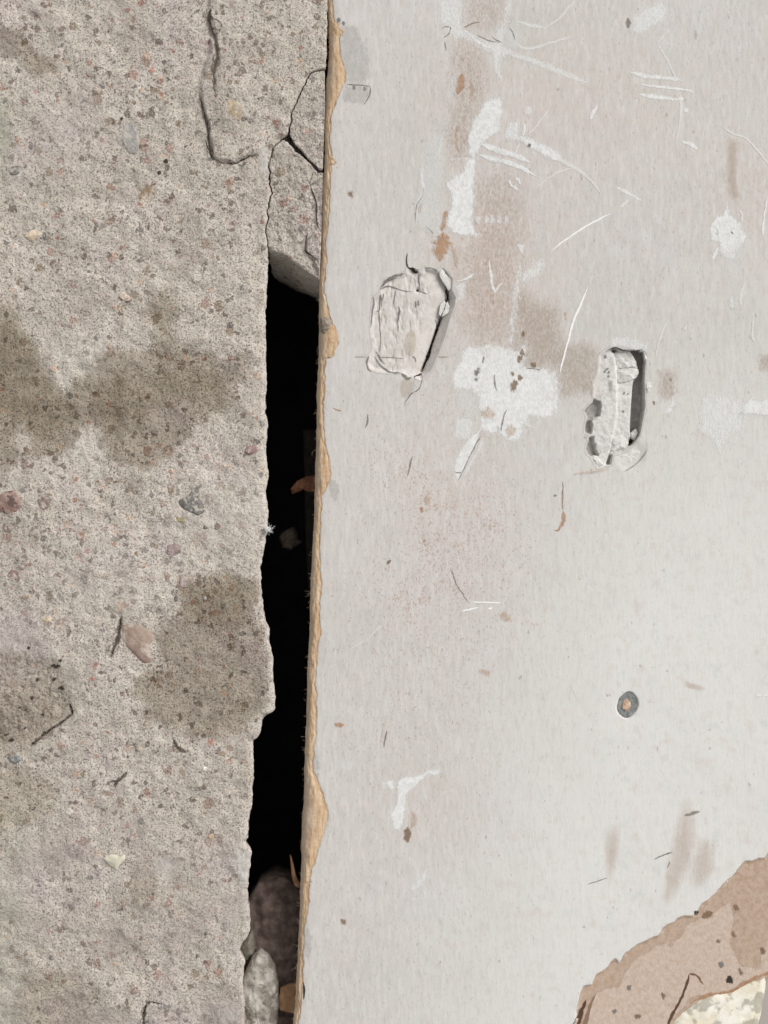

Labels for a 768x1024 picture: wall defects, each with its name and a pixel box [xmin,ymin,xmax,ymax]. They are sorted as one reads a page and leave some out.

crack [199,8,325,265]
spalling [582,346,652,470]
peeling [674,978,766,1024]